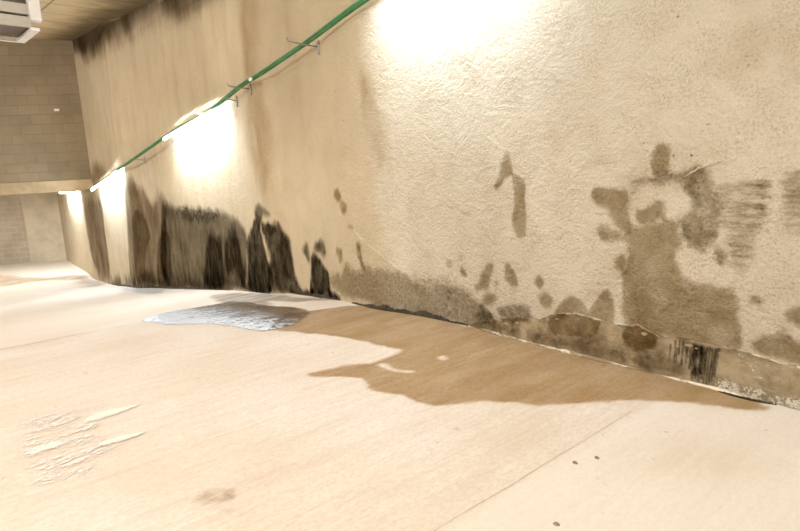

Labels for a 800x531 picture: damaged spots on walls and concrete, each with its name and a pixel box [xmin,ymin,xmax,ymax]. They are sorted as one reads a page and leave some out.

water stain [109,186,340,299]
water stain [674,341,800,410]